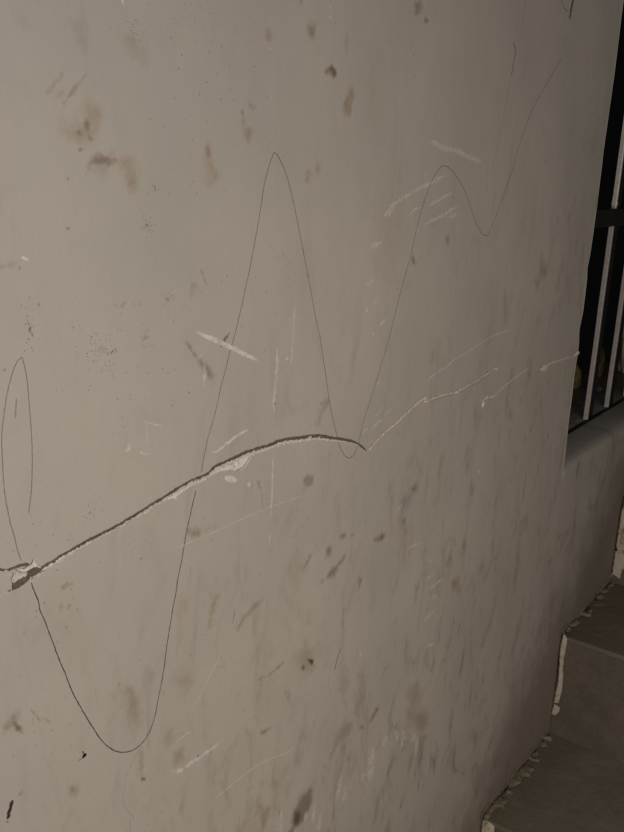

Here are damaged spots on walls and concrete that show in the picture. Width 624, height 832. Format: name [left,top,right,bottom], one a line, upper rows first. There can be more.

crack [0,351,579,571]
peeling [551,634,567,715]
peeling [480,820,494,832]